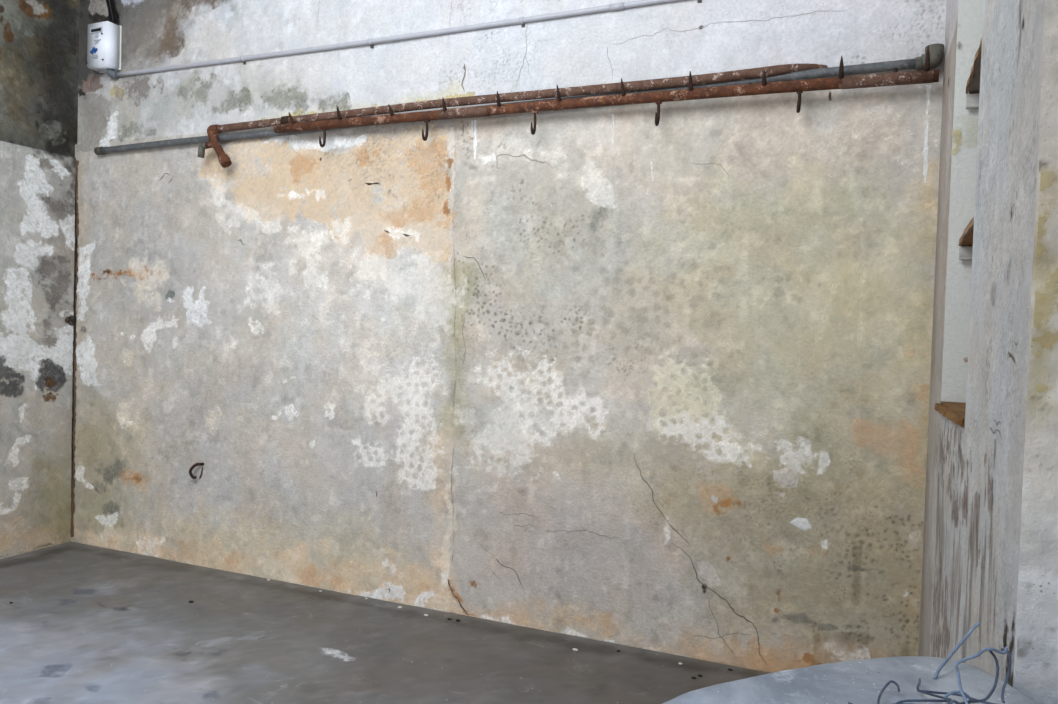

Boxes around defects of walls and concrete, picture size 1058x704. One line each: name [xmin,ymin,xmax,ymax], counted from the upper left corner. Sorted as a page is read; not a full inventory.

damp [201,125,453,261]
peeling [0,155,75,389]
rust [92,265,161,280]
damp [478,348,606,445]
efflorescence [651,356,762,467]
efflorescence [778,439,830,474]
crack [480,544,524,589]
crack [634,458,765,667]
mould [999,619,1014,686]